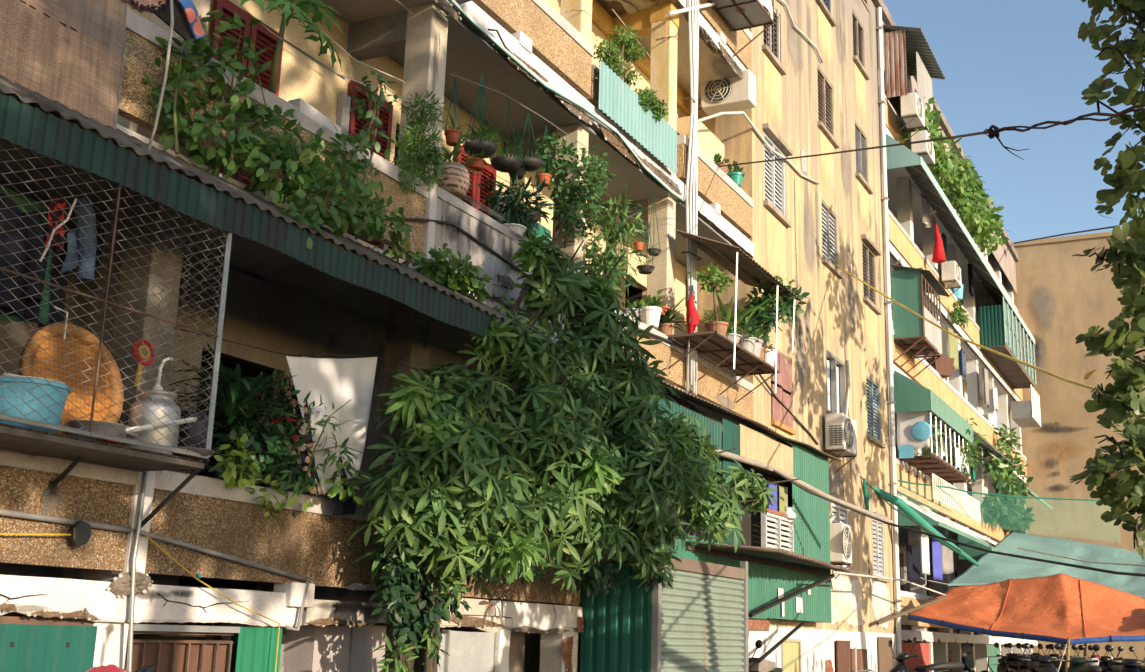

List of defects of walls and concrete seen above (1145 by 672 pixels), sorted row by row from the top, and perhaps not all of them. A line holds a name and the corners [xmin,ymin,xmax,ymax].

spalling [107,569,153,598]
crack [0,593,46,601]
spalling [0,600,101,621]
crack [161,595,247,612]
spalling [449,614,585,672]